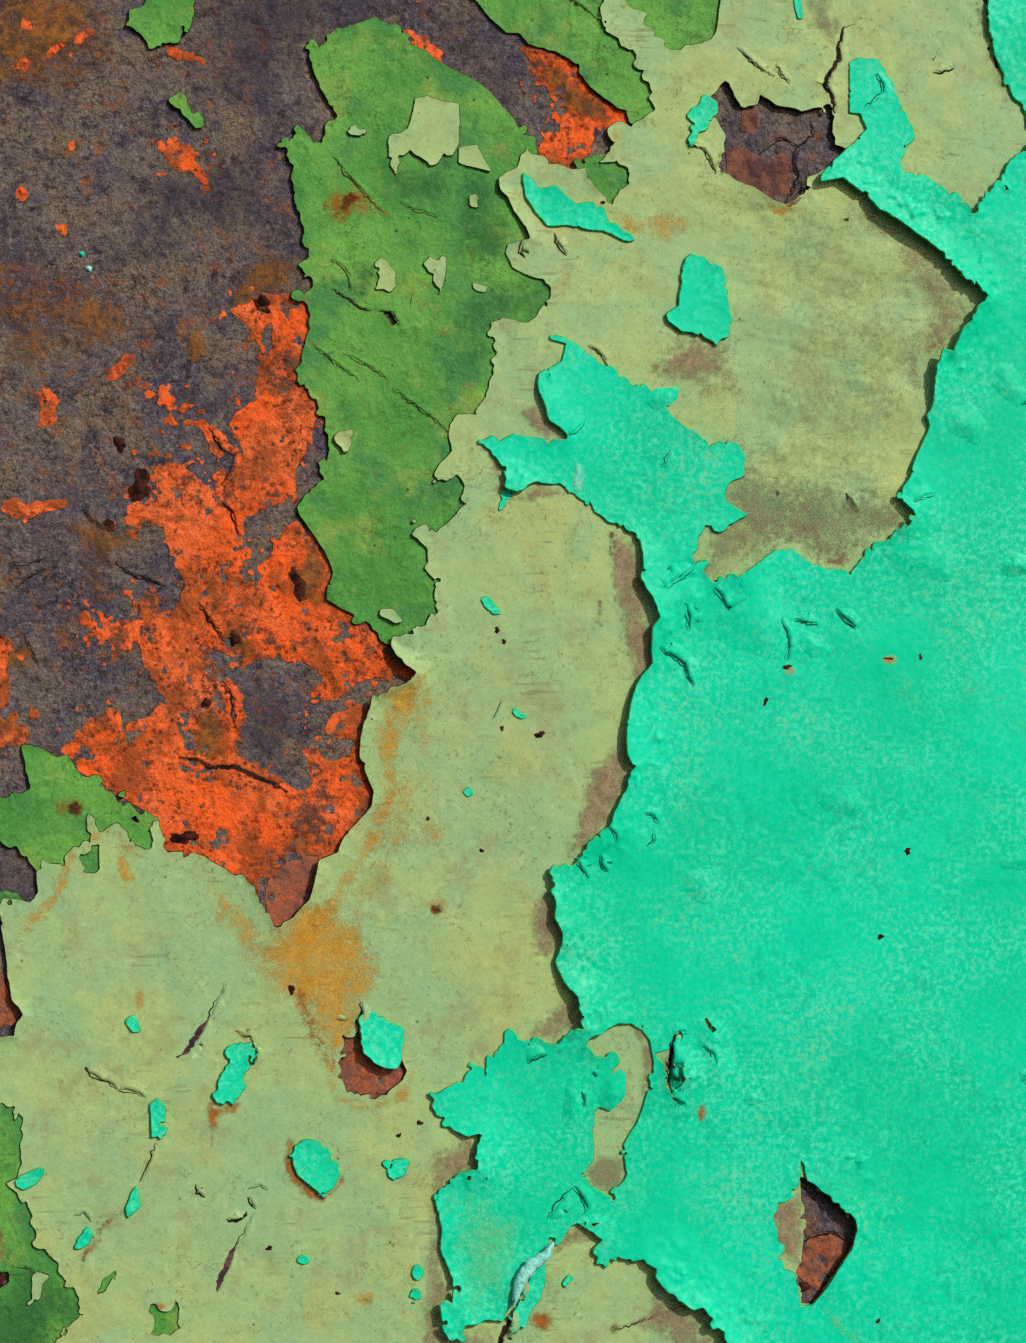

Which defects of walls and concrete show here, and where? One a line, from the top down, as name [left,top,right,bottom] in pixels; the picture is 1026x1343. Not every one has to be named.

rust [113,436,126,453]
rust [128,468,151,502]
peeling [0,0,653,1059]
rust [288,536,329,604]
peeling [429,0,1026,1343]
rust [169,831,199,845]
rust [0,970,22,1028]
rust [220,854,408,1105]
peeling [212,1042,260,1105]
peeling [355,1009,404,1084]
peeling [289,1139,341,1198]
peeling [0,1082,116,1343]